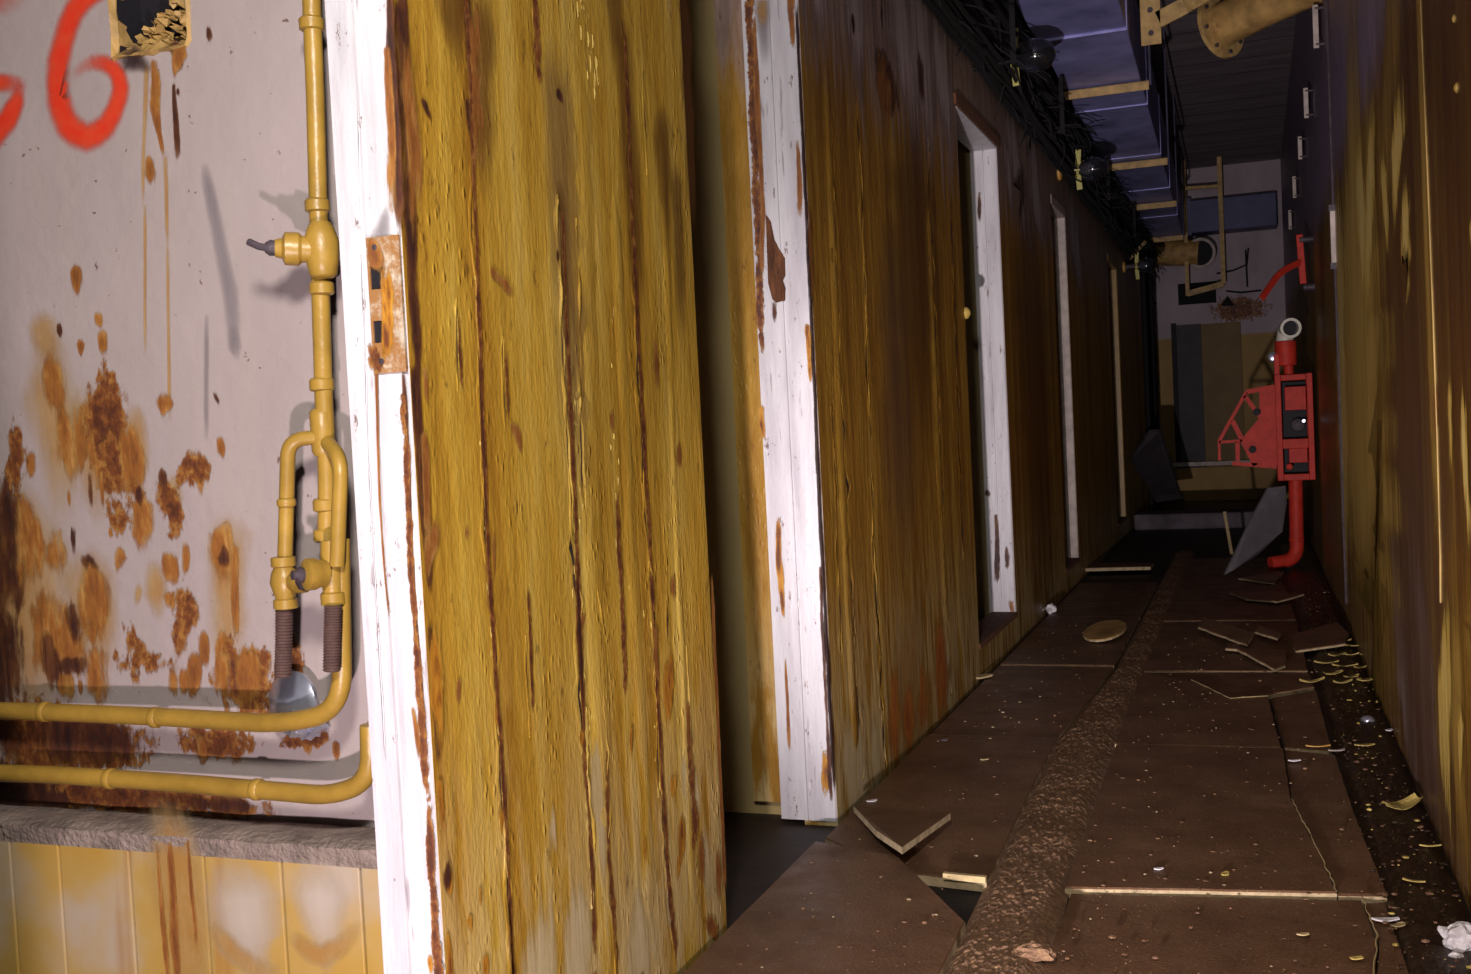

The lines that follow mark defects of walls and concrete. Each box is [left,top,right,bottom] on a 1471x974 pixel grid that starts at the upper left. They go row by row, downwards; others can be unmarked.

spalling [108,0,192,69]
corrosion [142,46,187,236]
corrosion [744,0,765,353]
corrosion [70,265,82,294]
corrosion [505,350,522,452]
corrosion [367,0,461,974]
corrosion [776,520,785,616]
corrosion [0,313,305,974]
corrosion [279,731,340,759]